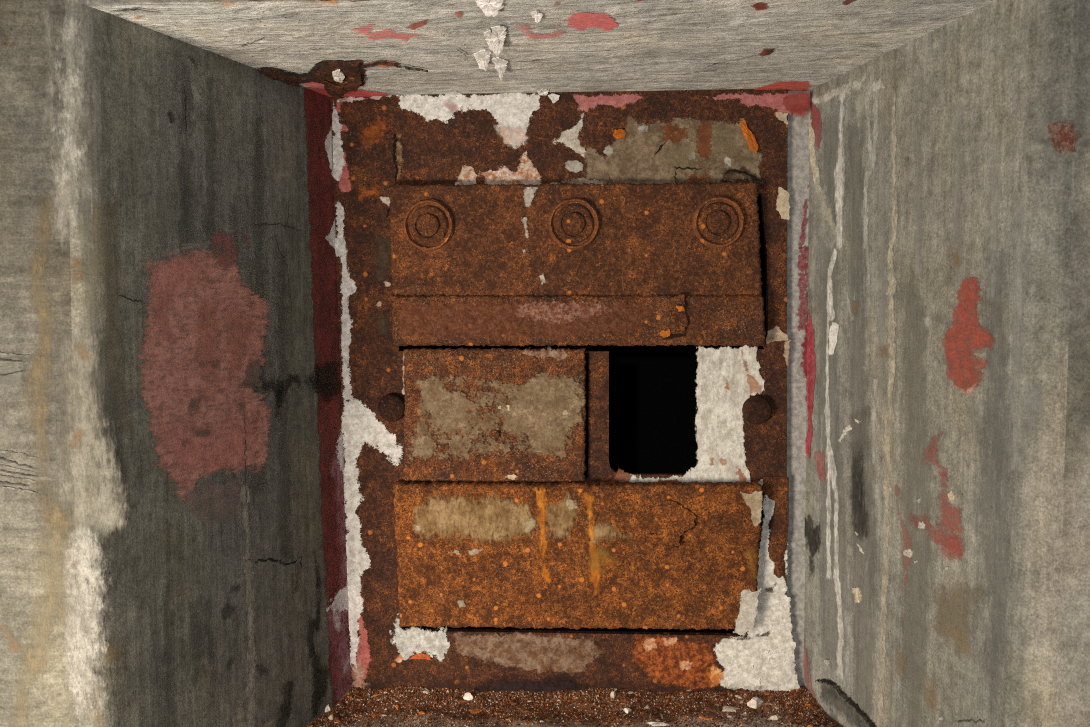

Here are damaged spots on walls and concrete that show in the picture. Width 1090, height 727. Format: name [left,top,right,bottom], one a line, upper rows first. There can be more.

peeling [457,0,517,80]
peeling [256,60,836,252]
rust [739,120,758,154]
peeling [398,299,654,360]
peeling [325,202,585,668]
rust [535,488,551,582]
rust [584,492,612,595]
peeling [614,326,808,724]
rust [763,477,789,578]
peeling [389,618,604,674]
rust [438,635,716,692]
crack [815,679,876,727]